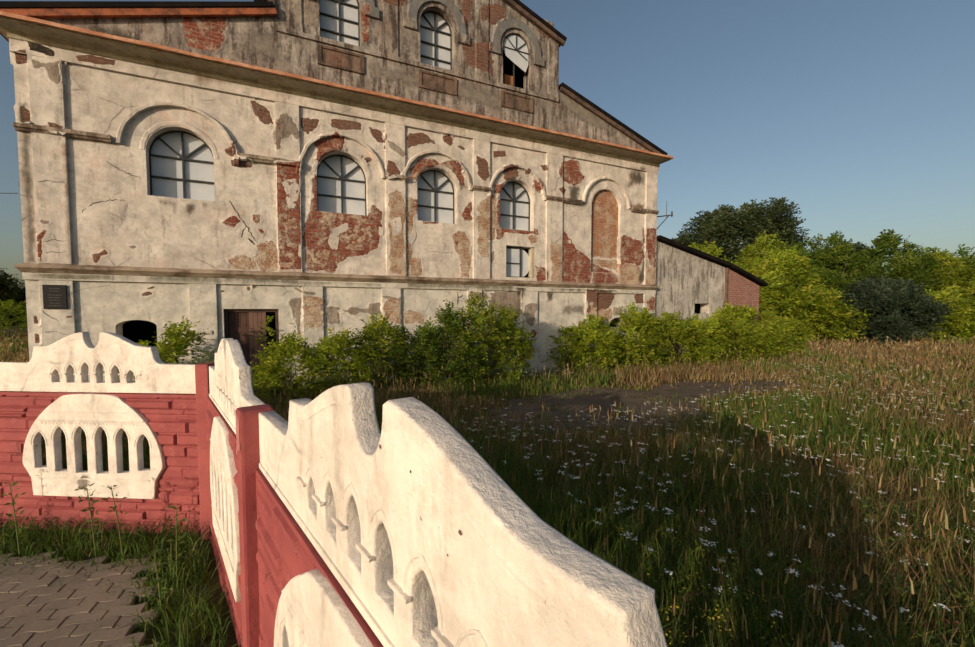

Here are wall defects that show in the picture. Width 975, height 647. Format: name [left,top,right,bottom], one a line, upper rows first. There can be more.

spalling [178,17,232,55]
spalling [361,0,411,45]
spalling [458,0,508,79]
crack [229,200,267,245]
spalling [220,97,657,363]